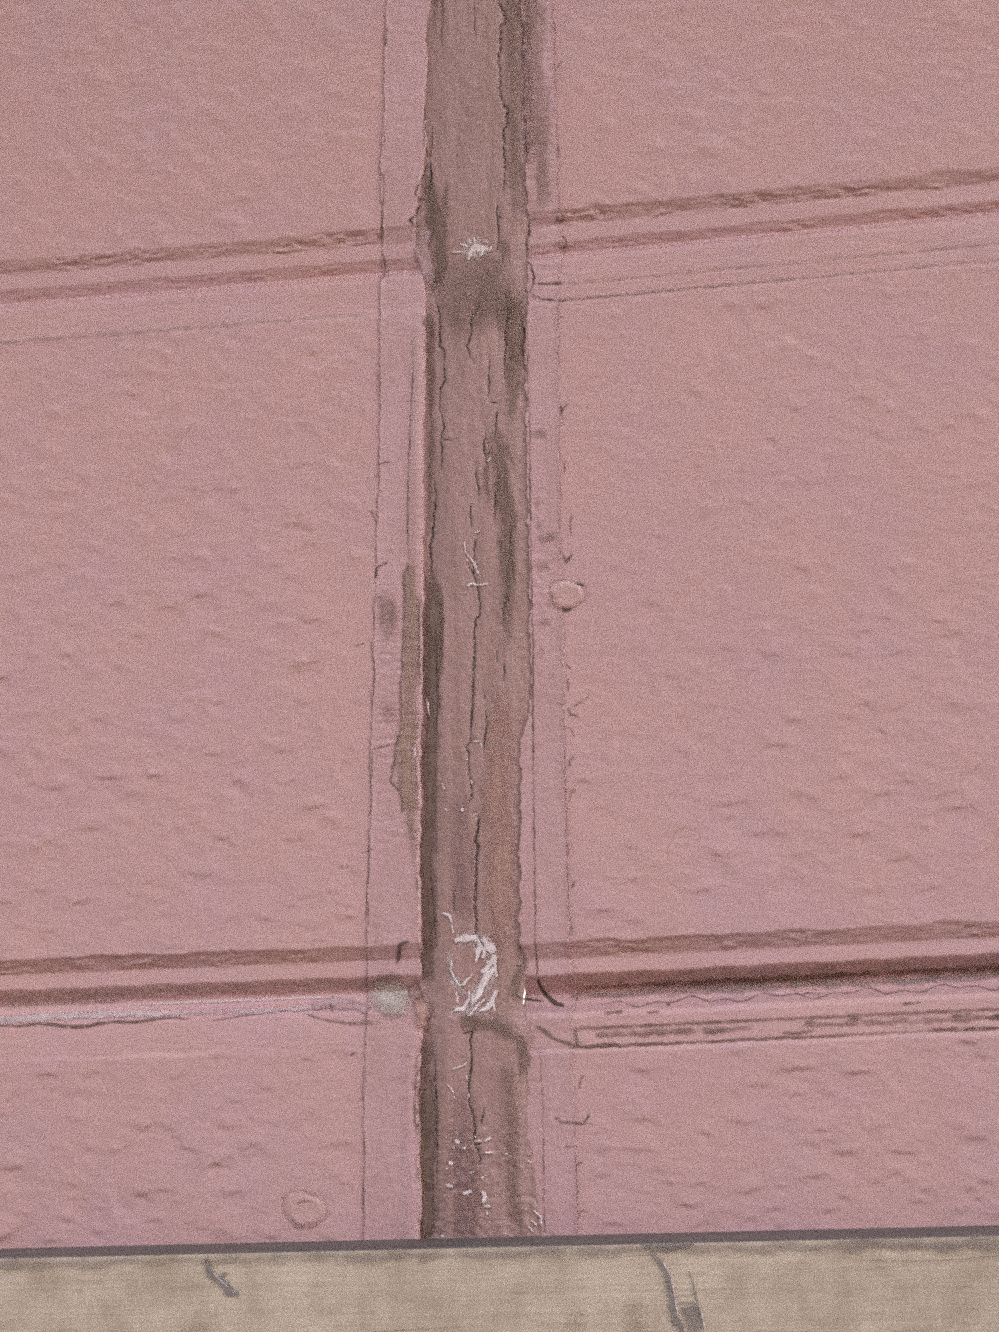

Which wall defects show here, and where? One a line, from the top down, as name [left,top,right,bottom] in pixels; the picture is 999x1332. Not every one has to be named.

crack [375,0,574,1007]
peeling [389,565,430,834]
peeling [447,934,498,1016]
crack [464,1029,485,1161]
crack [543,1076,595,1232]